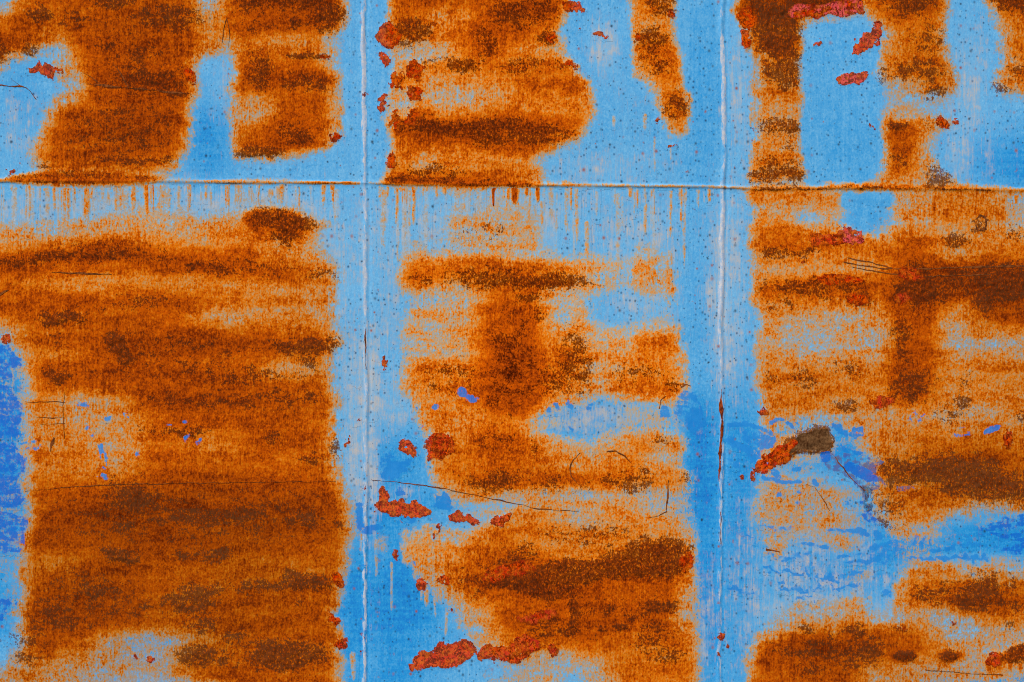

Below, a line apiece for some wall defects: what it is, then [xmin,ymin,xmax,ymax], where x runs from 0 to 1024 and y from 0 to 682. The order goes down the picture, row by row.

peeling [808,38,826,50]
peeling [832,18,889,89]
peeling [360,88,370,105]
corrosion [0,0,712,682]
corrosion [371,0,1024,682]
peeling [396,430,459,464]
peeling [358,478,515,542]
peeling [414,570,452,594]
peeling [404,605,534,674]